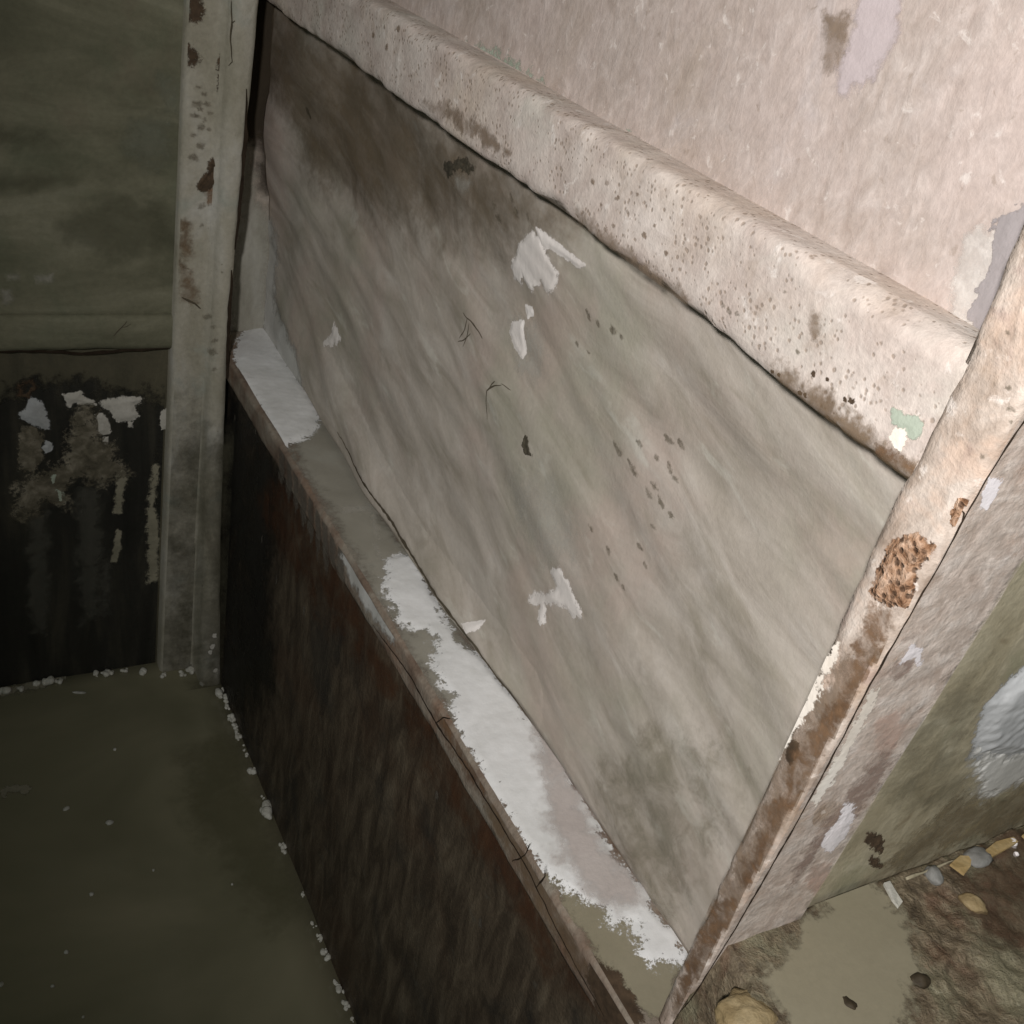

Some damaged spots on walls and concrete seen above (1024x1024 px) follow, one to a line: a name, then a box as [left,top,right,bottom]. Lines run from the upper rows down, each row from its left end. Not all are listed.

crack [458,313,482,346]
peeling [8,390,142,524]
damp [878,443,915,479]
flaking render [888,407,924,452]
damp [203,0,889,1018]
corrosion [743,606,890,888]
corrosion [696,898,736,957]
corrosion [677,957,698,1003]